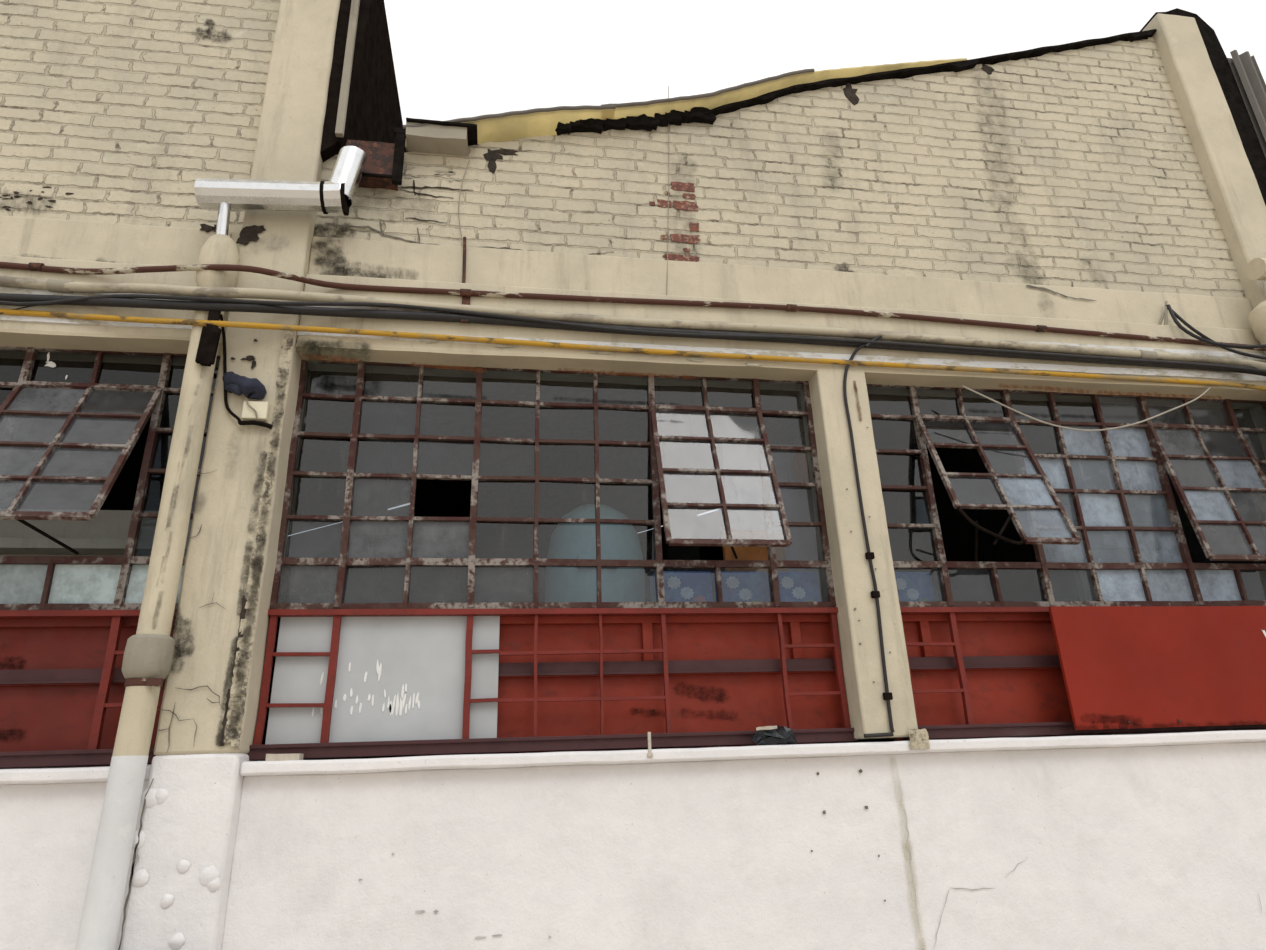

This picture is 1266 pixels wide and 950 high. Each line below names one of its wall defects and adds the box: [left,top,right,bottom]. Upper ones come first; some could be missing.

spalling [843,83,859,105]
spalling [236,225,266,245]
leakage [313,225,385,278]
crack [325,180,473,245]
crack [482,244,533,252]
flaking render [649,181,700,262]
leakage [216,372,285,746]
crack [157,685,224,751]
crack [118,779,154,950]
crack [897,775,1027,947]